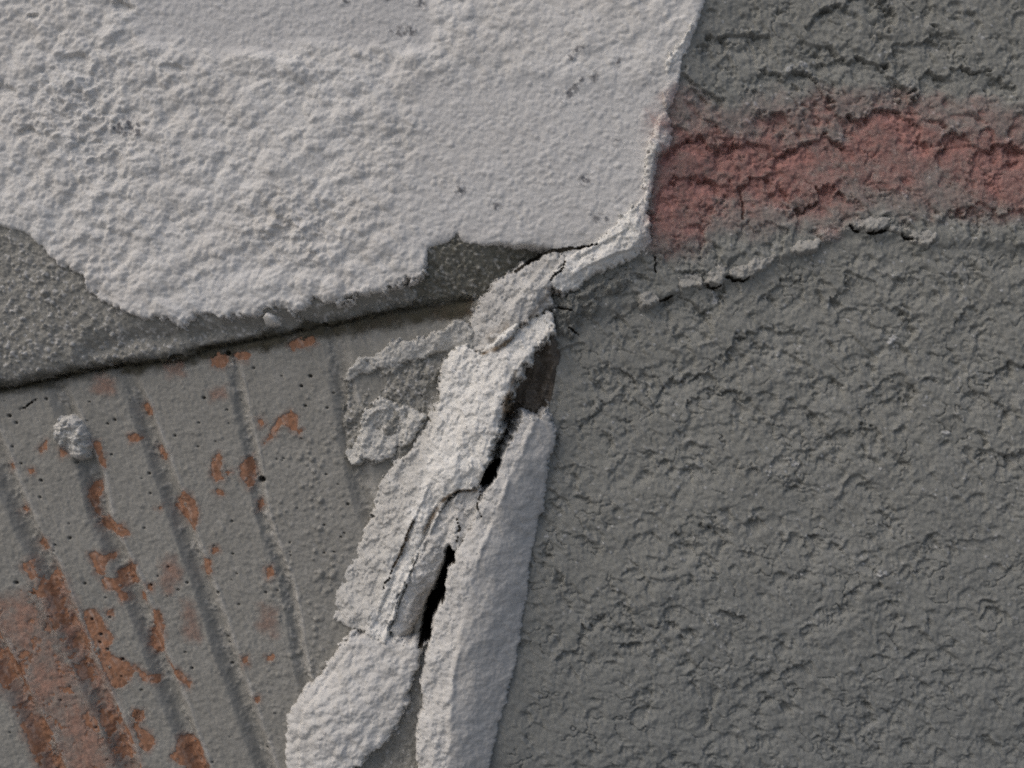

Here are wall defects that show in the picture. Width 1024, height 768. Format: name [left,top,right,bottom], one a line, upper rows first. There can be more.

crack [514,243,598,281]
crack [557,306,577,334]
crack [16,362,128,409]
flaking render [0,14,701,768]
crack [418,458,501,649]